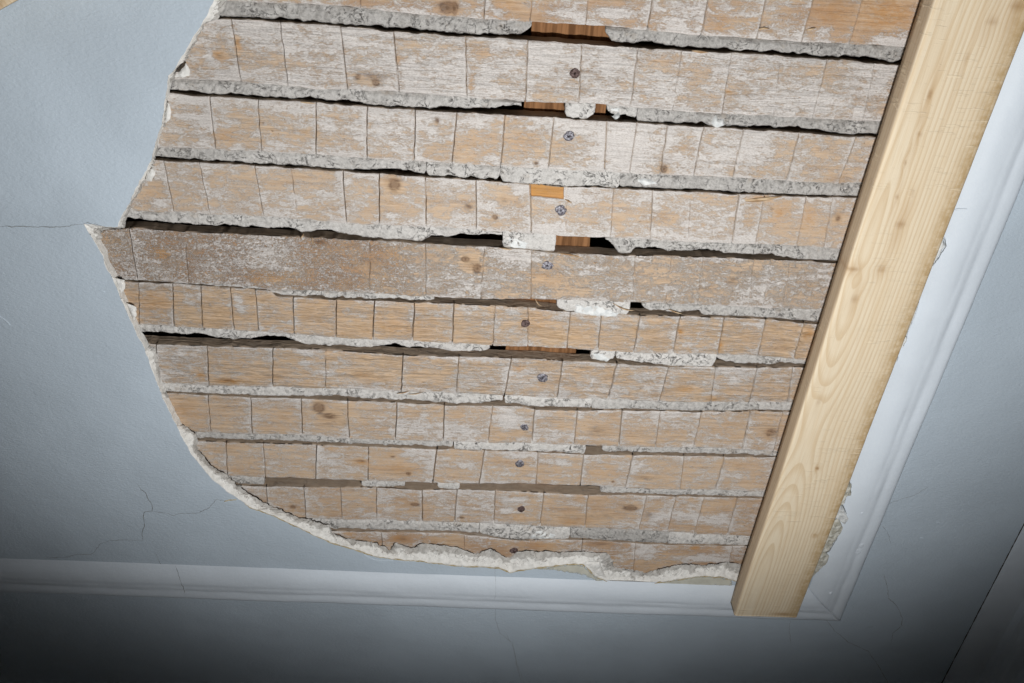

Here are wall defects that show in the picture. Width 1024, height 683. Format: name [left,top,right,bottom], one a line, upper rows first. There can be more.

flaking render [84,0,742,586]
crack [56,424,607,593]
crack [657,562,739,570]
flaking render [812,482,852,577]